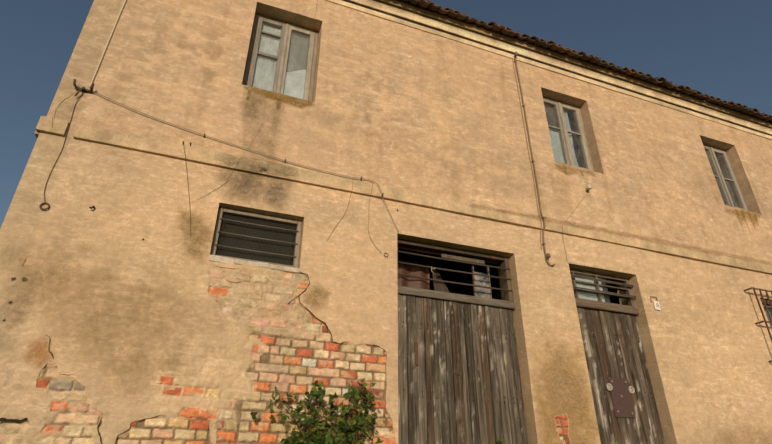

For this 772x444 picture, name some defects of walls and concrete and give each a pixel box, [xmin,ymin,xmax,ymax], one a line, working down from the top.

flaking render [115,261,396,444]
flaking render [0,364,105,444]
flaking render [555,414,570,444]